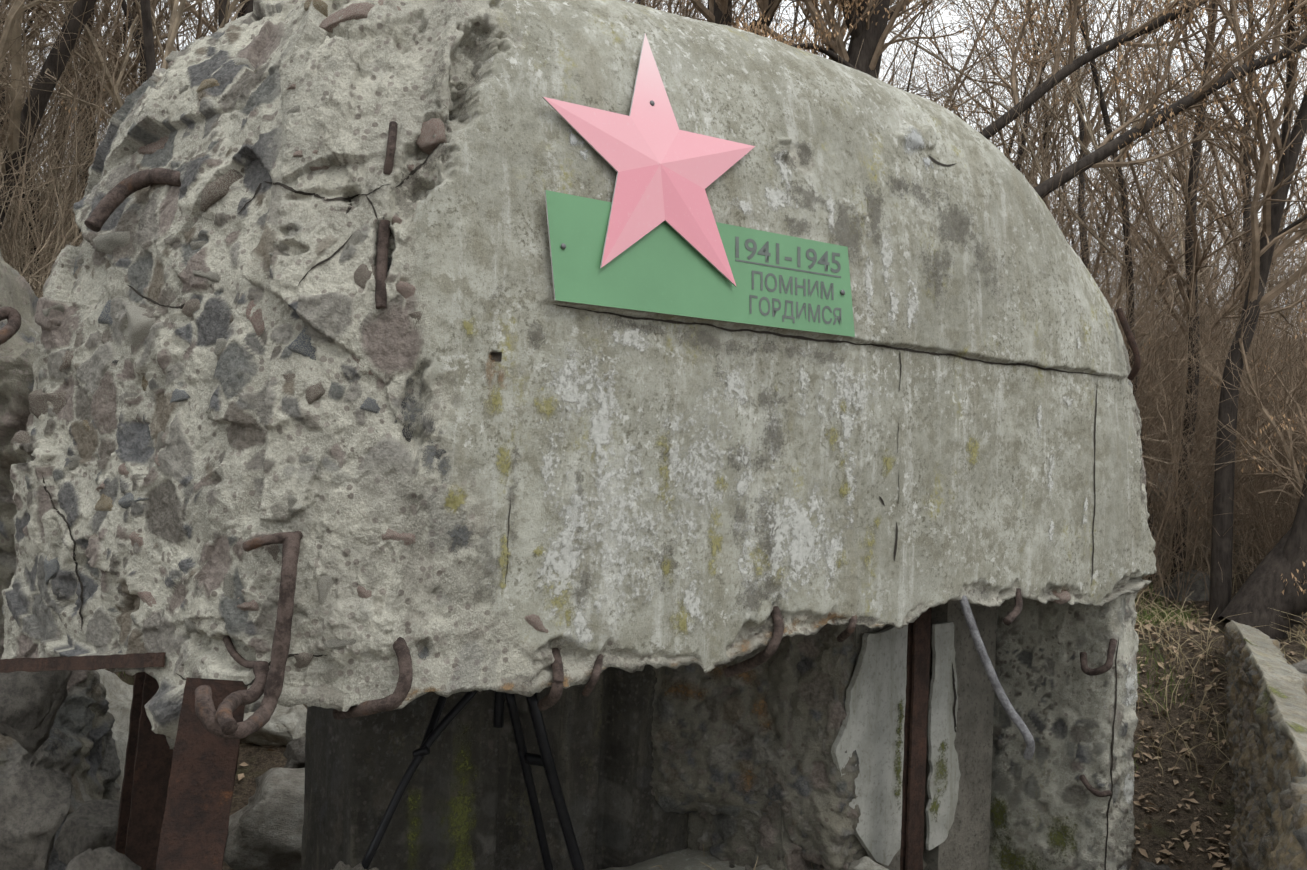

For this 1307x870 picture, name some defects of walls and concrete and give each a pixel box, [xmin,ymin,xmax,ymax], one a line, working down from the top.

spalling [84,168,181,232]
crack [237,155,429,287]
spalling [375,121,450,309]
crack [126,284,185,309]
crack [42,475,83,629]
spalling [195,531,303,739]
spalling [332,637,429,720]
spalling [507,648,567,711]
spalling [582,654,621,697]
spalling [723,606,810,678]
flaking render [831,615,908,866]
flaking render [925,595,1035,850]